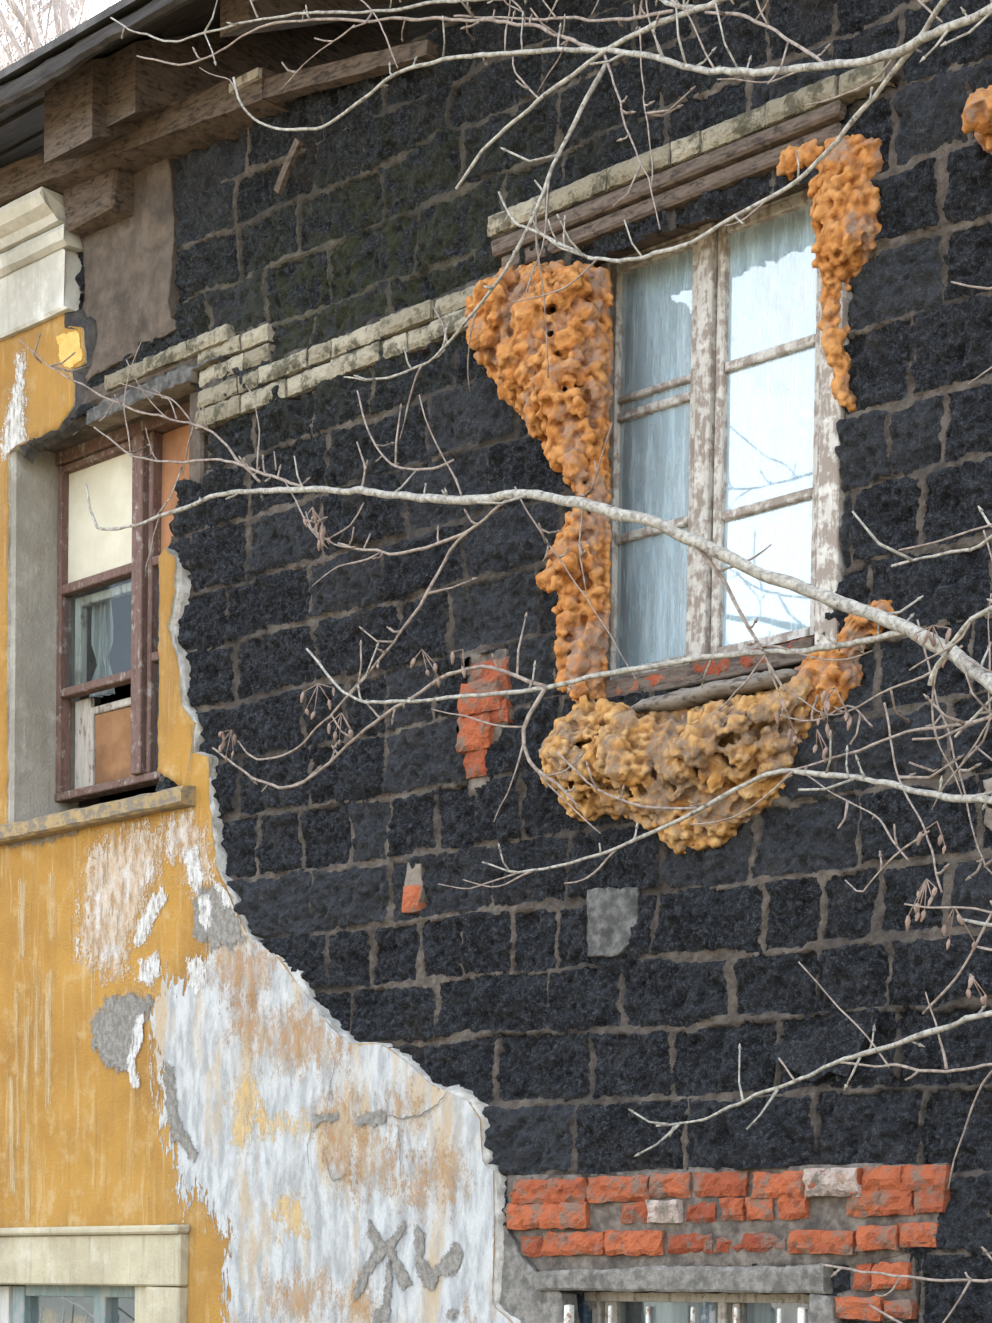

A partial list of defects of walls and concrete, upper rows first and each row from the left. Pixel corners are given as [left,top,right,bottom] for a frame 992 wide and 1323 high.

flaking render [20,0,992,671]
flaking render [67,333,992,1323]